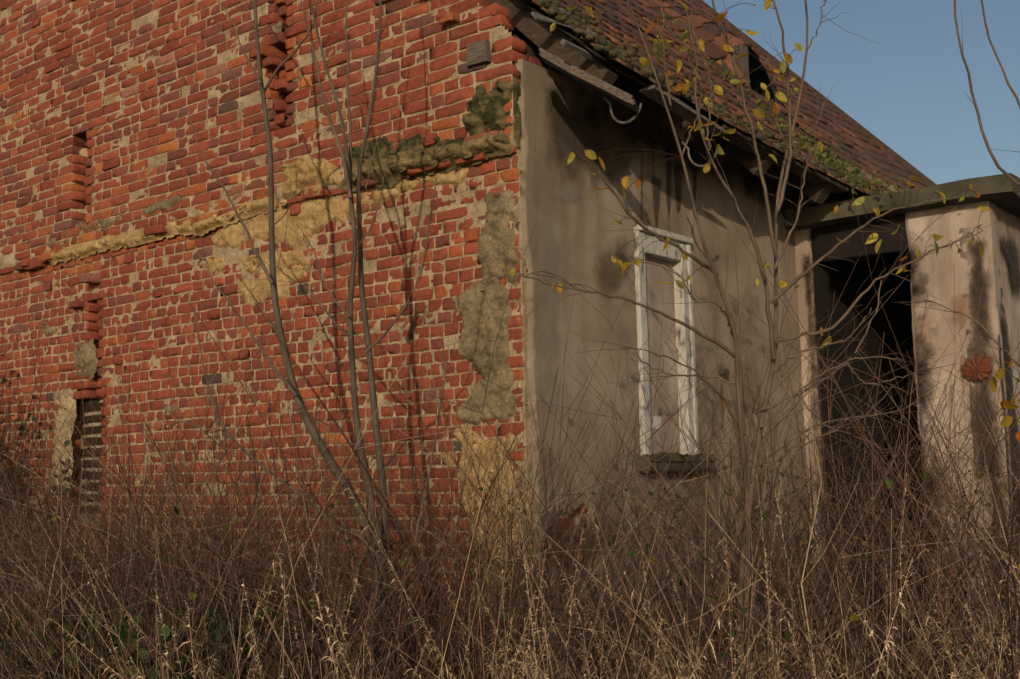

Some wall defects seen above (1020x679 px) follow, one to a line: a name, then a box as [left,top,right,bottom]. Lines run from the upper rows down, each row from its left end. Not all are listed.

spalling [211,167,468,306]
damp [970,237,1020,564]